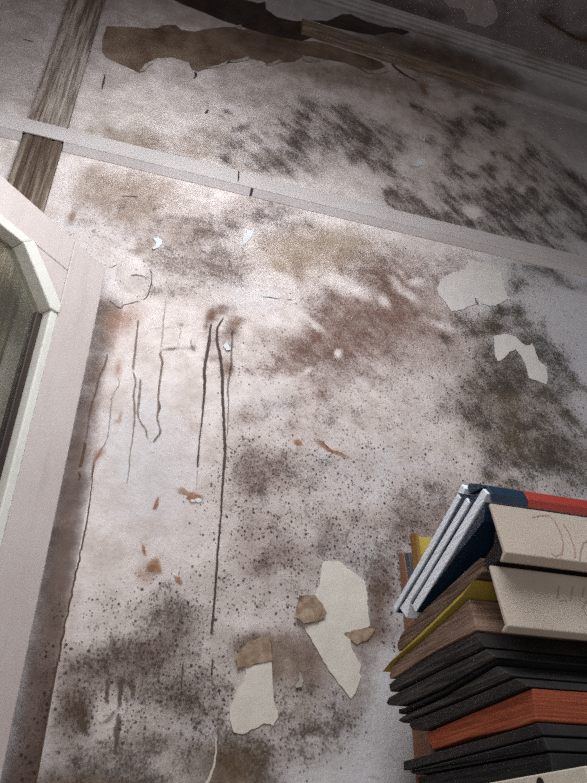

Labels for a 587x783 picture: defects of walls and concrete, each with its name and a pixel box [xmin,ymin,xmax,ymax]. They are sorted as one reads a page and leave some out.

peeling [102,0,388,74]
peeling [312,14,409,35]
peeling [444,0,498,27]
leakage [220,99,587,251]
crack [110,270,152,308]
peeling [437,259,508,311]
peeling [494,334,548,385]
leakage [6,202,587,783]
crack [34,464,94,783]
peeling [296,561,375,698]
peeling [230,636,278,734]